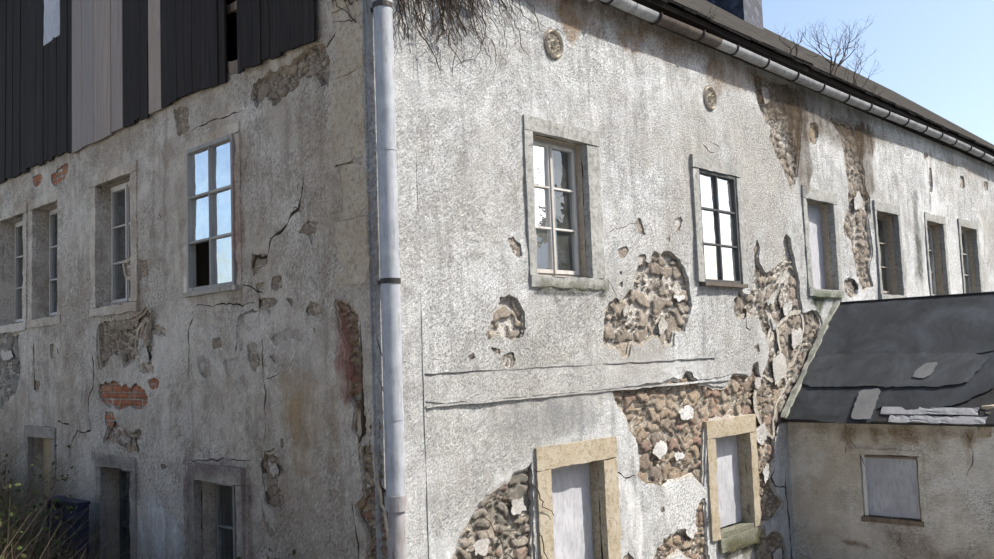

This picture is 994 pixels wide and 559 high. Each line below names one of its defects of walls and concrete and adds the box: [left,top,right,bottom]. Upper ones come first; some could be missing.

flaking render [253,43,330,108]
leakage [755,78,874,191]
flaking render [830,119,872,298]
flaking render [0,325,21,413]
flaking render [98,308,166,453]
crack [188,178,304,504]
flaking render [336,299,395,559]
flaking render [486,295,524,368]
flaking render [602,217,691,359]
flaking render [612,235,822,559]
crack [351,506,359,558]
flaking render [449,464,534,559]